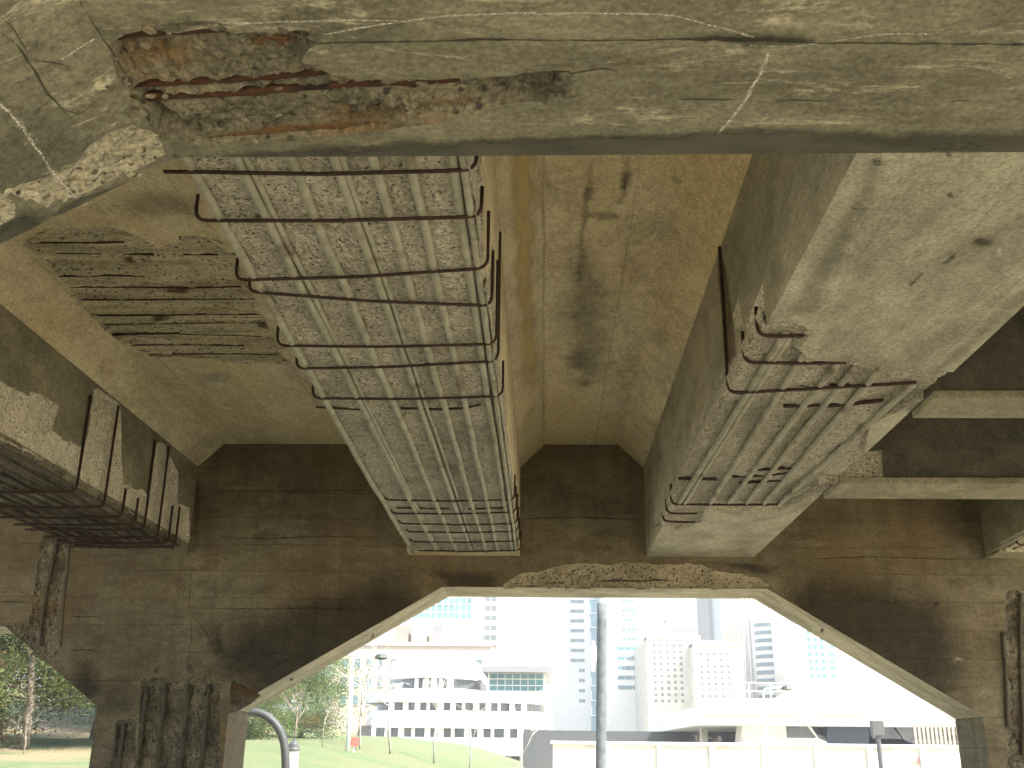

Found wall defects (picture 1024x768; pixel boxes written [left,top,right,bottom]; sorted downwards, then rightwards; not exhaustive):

crack [2,18,99,120]
crack [80,1,134,88]
corrosion [209,121,372,138]
crack [316,37,1024,46]
crack [678,96,734,104]
spalling [0,23,581,554]
water stain [204,130,1024,384]
spalling [659,246,954,530]
spalling [0,381,190,665]
spalling [502,562,770,589]
spalling [109,677,261,768]
spalling [1001,590,1024,768]